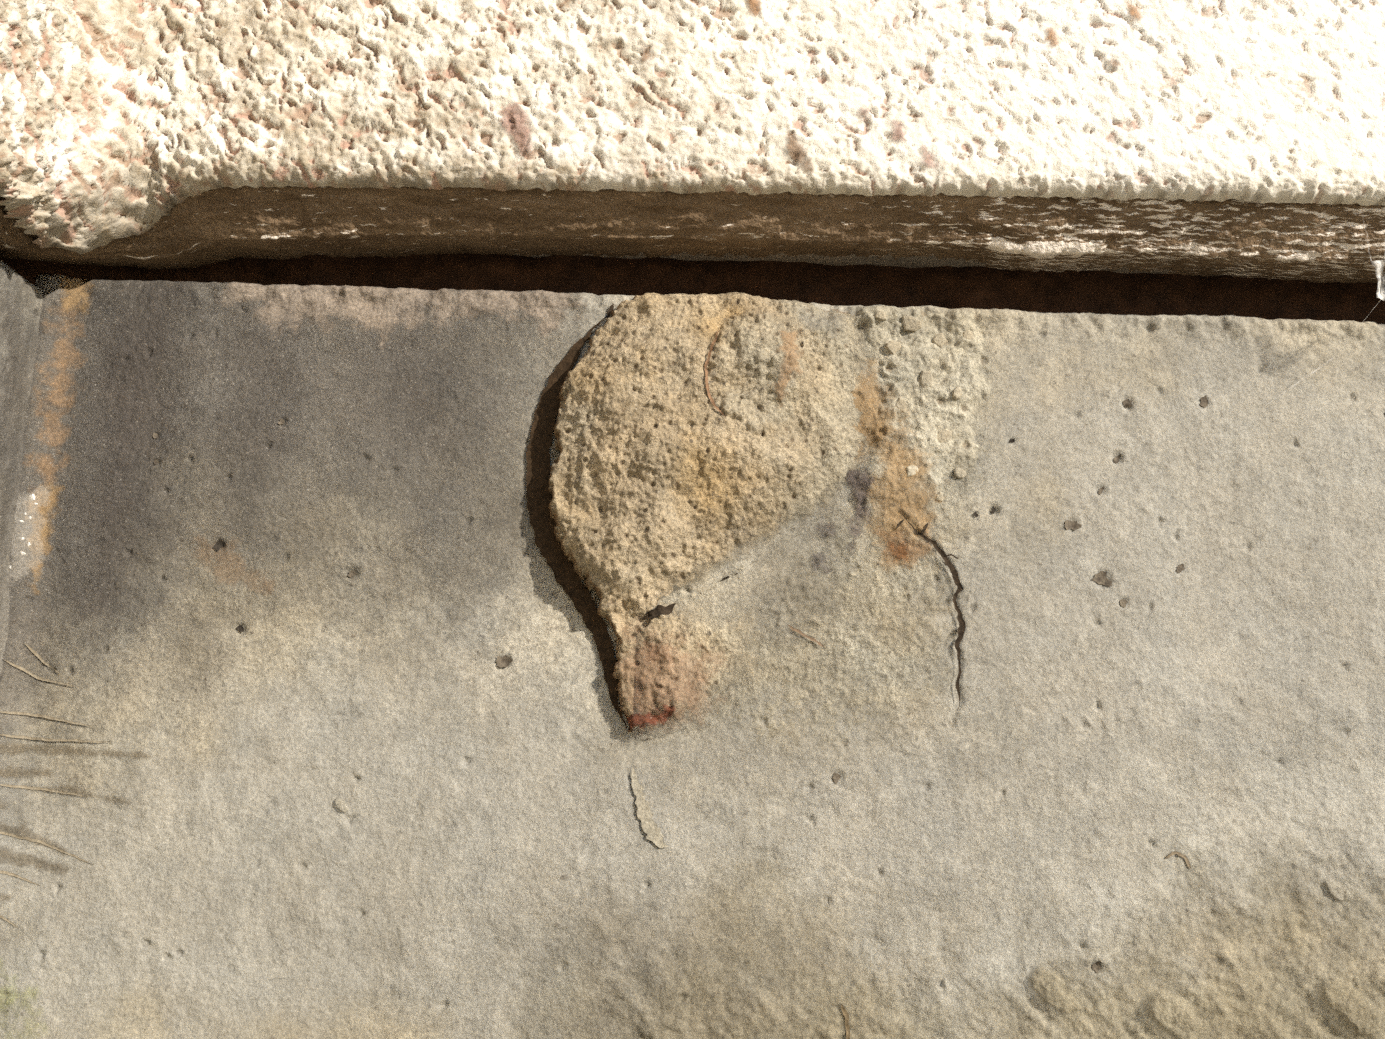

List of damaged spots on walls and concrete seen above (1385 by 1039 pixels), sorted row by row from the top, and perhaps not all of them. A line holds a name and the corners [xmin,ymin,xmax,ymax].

corrosion [63,277,87,309]
corrosion [29,488,59,573]
leakage [0,267,1385,1039]
crack [897,517,966,713]